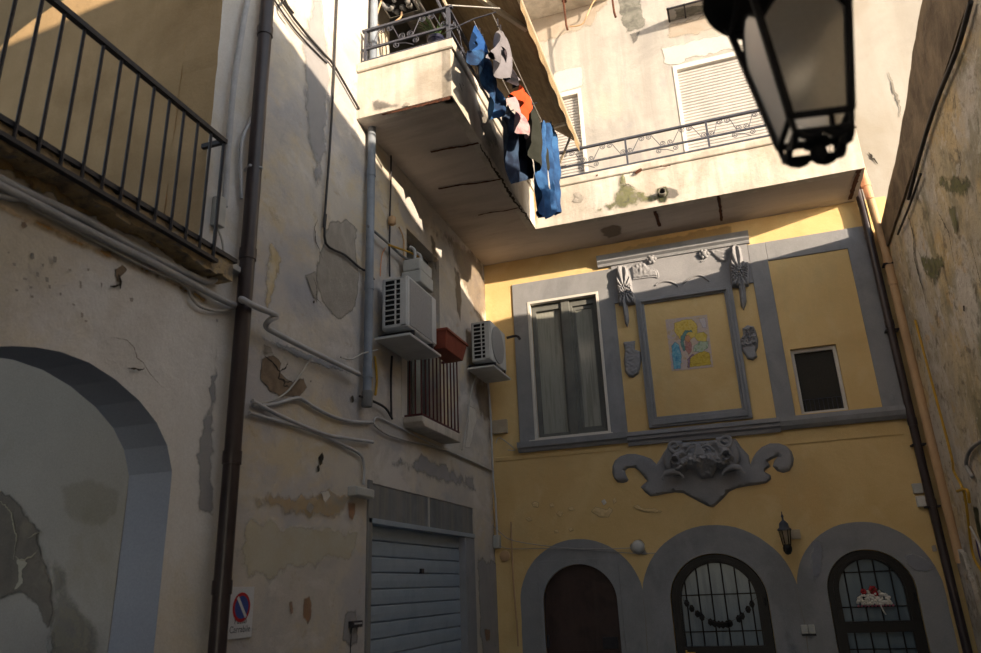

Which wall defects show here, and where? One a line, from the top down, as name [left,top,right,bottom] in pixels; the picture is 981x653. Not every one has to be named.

flaking render [101,265,127,290]
flaking render [305,219,359,319]
flaking render [261,345,311,397]
flaking render [256,490,347,517]
flaking render [0,491,53,627]